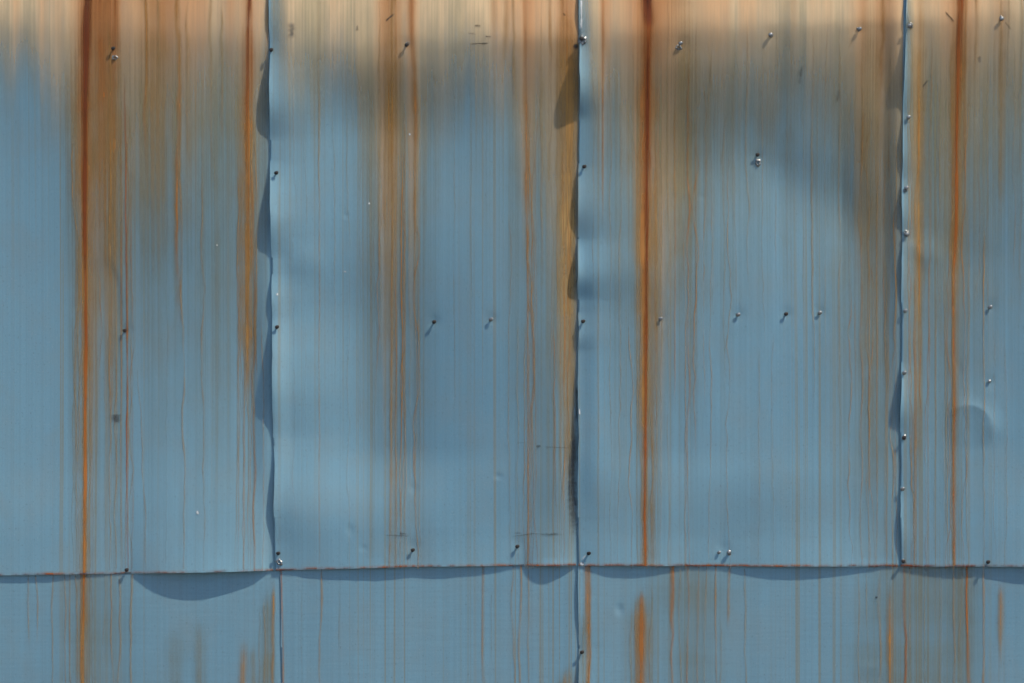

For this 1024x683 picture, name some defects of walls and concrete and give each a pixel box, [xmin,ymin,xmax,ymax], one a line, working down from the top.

rust [71,0,132,683]
rust [237,0,257,382]
rust [390,168,419,466]
rust [521,0,811,683]
rust [947,0,968,505]